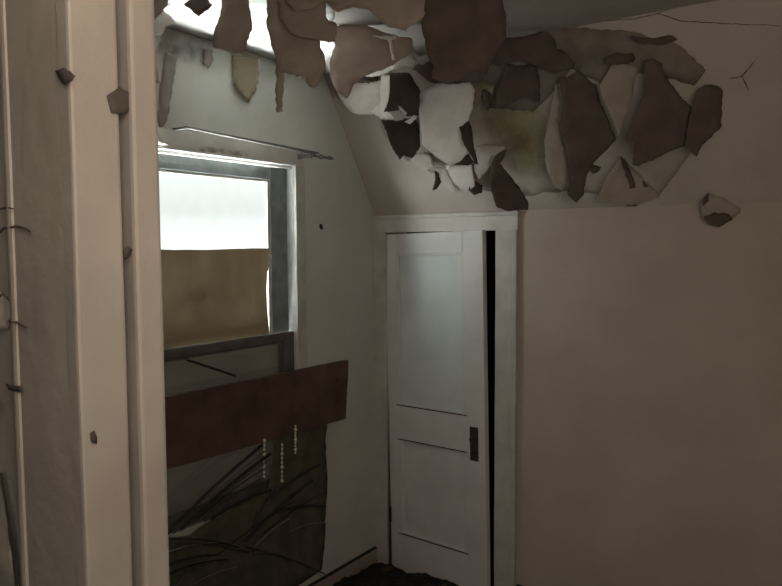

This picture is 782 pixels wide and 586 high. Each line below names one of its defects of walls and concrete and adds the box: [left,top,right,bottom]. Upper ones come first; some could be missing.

peeling [154,0,723,211]
peeling [700,193,741,227]